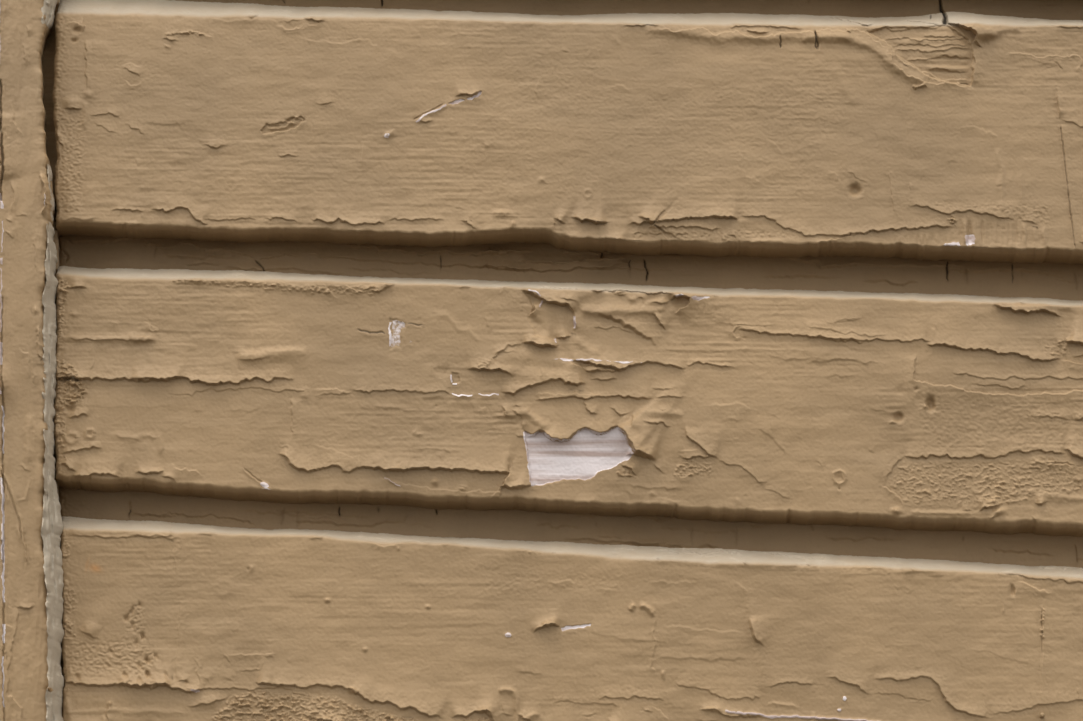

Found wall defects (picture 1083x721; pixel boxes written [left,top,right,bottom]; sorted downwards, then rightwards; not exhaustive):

peeling [620,13,1001,94]
crack [1050,19,1083,27]
crack [1005,49,1083,250]
peeling [550,197,1055,250]
crack [0,0,42,721]
peeling [168,244,735,388]
peeling [902,298,1083,425]
peeling [878,439,1083,536]
spalling [64,586,173,690]
crack [65,676,254,717]
peeling [211,672,502,721]
crack [549,667,1083,721]